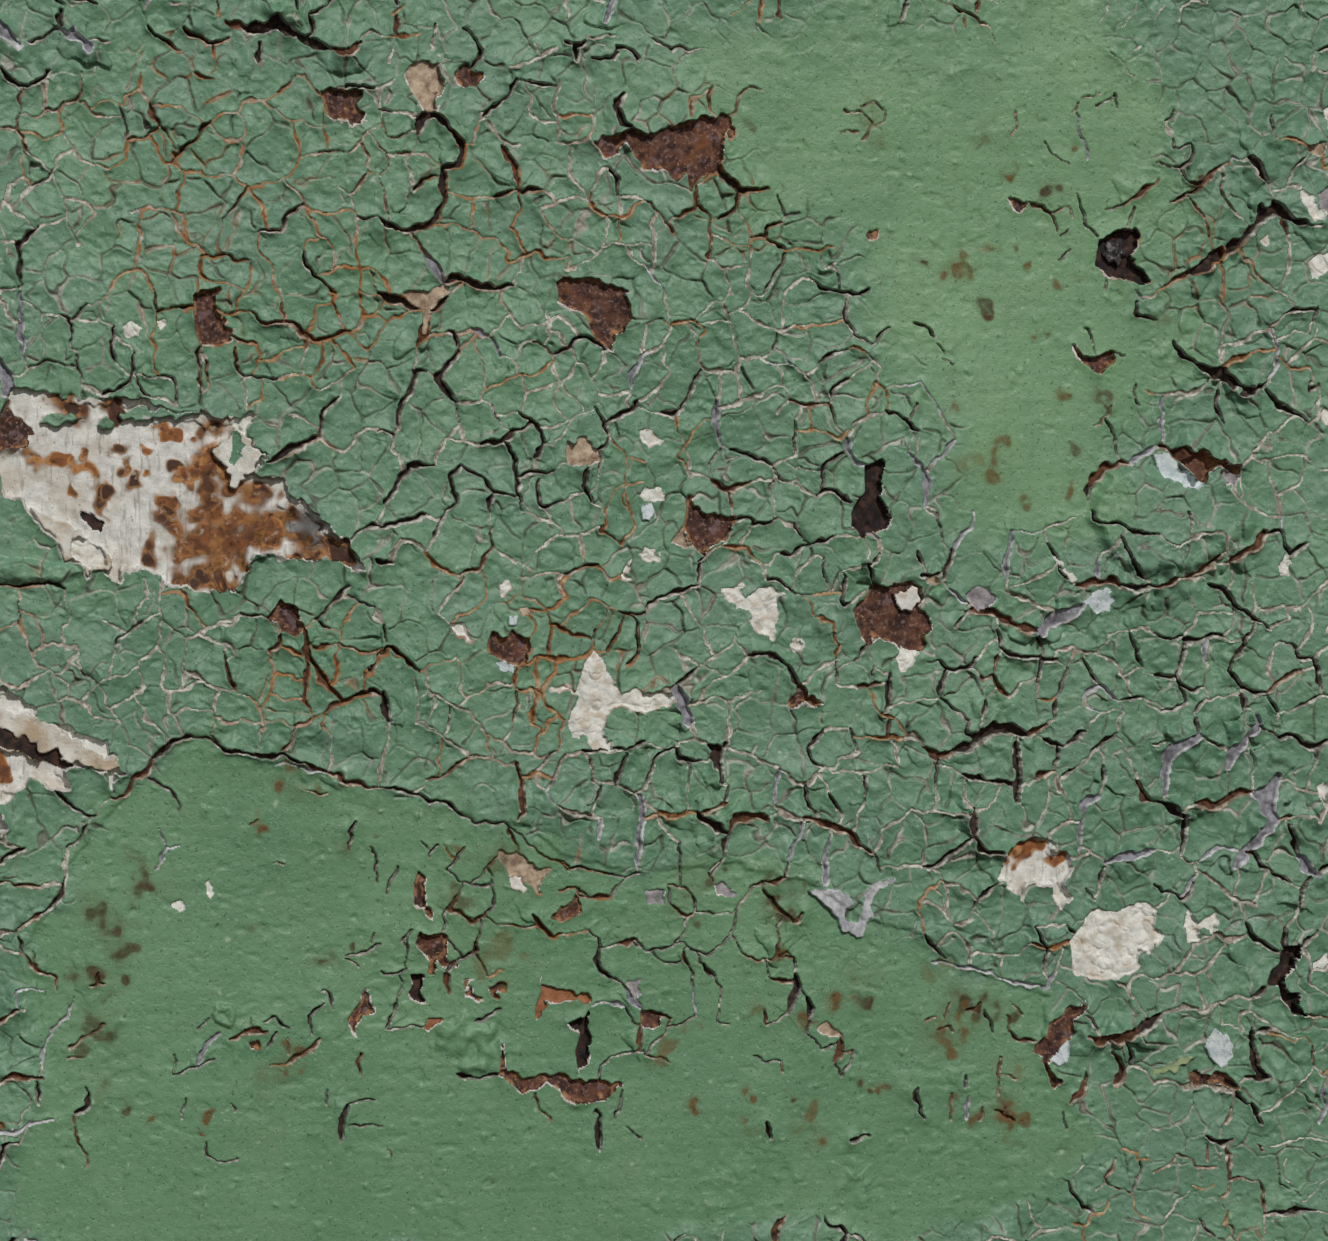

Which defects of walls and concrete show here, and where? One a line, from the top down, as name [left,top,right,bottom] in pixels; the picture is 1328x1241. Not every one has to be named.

crack [147,0,451,68]
peeling [0,388,366,593]
crack [0,67,1328,1031]
peeling [894,576,941,612]
peeling [0,686,127,839]
peeling [549,651,679,754]
crack [442,845,697,1064]
crack [741,902,855,1078]
peeling [997,837,1074,911]
peeling [1069,902,1164,981]
crack [1085,869,1328,1127]
crack [982,1135,1328,1241]